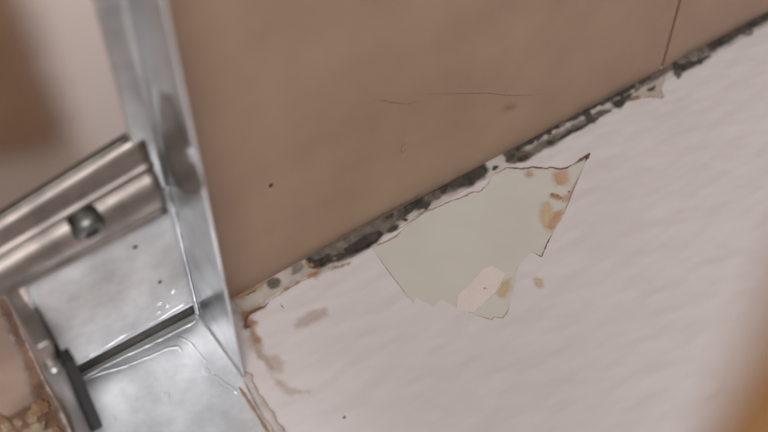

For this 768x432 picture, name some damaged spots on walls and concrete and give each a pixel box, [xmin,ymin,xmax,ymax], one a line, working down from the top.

mould [292,12,768,274]
mould [267,278,280,289]
peeling [231,259,329,330]
peeling [373,153,590,320]